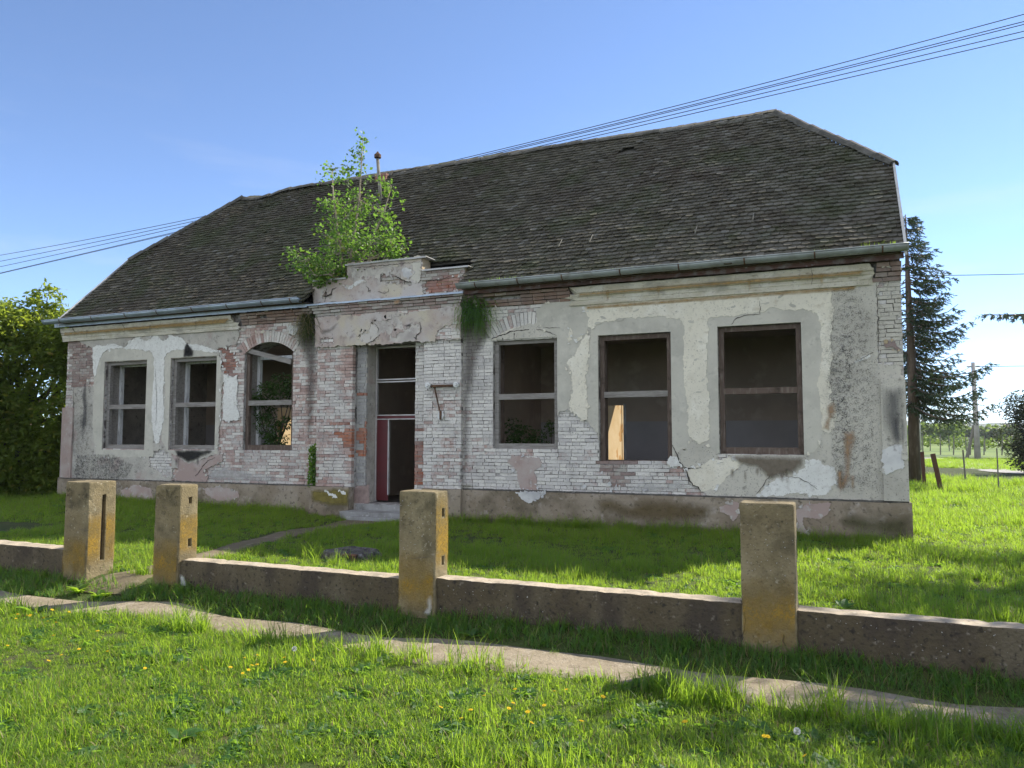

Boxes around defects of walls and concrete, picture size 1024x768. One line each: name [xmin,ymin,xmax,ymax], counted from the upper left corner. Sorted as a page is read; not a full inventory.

peeling [342,262,462,294]
peeling [356,315,422,343]
spalling [852,282,903,366]
leakage [580,271,873,487]
peeling [67,335,240,501]
spalling [330,421,367,457]
peeling [536,294,839,535]
leakage [889,394,898,435]
flaking render [507,454,546,501]